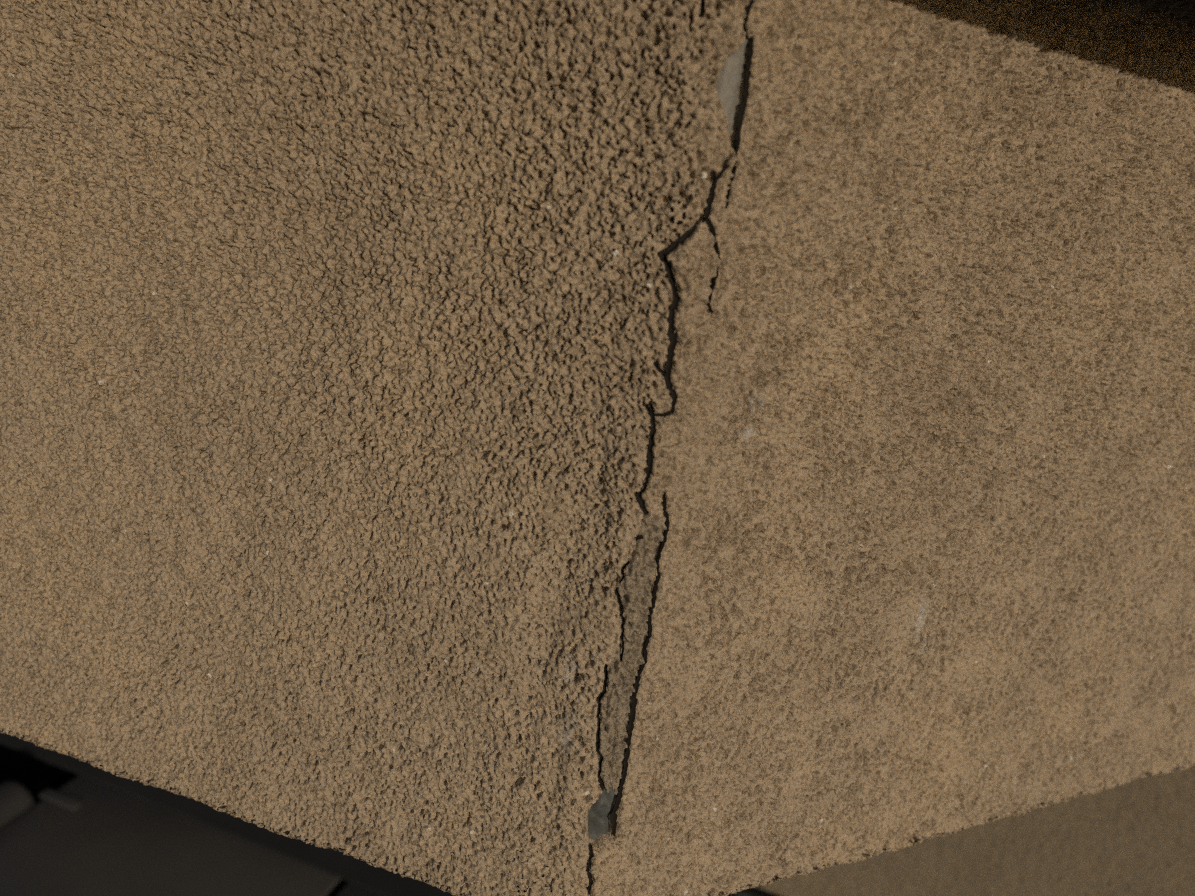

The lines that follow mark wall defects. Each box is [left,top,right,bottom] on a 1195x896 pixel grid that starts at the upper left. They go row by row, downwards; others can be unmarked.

flaking render [666,38,749,386]
crack [586,0,755,896]
spalling [588,514,667,840]